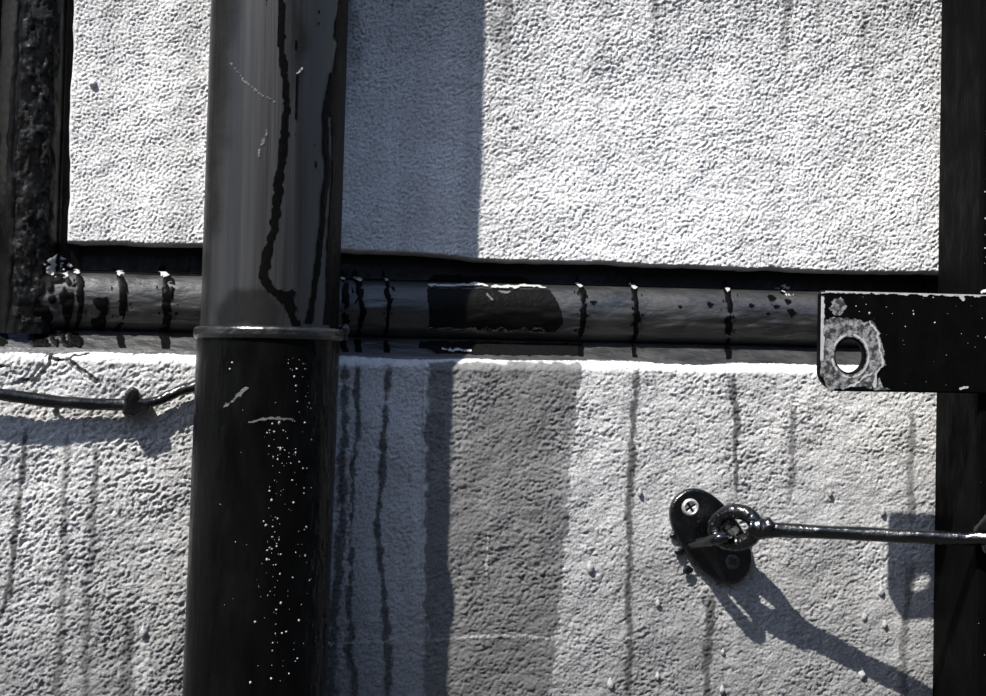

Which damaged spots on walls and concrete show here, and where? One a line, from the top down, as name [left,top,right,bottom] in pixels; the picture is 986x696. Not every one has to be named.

damp [382,271,395,352]
damp [628,277,644,357]
damp [721,279,739,359]
damp [0,433,27,613]
damp [310,354,361,696]
damp [373,371,393,696]
damp [422,276,590,696]
damp [624,371,639,690]
damp [729,379,741,490]
damp [701,595,715,696]